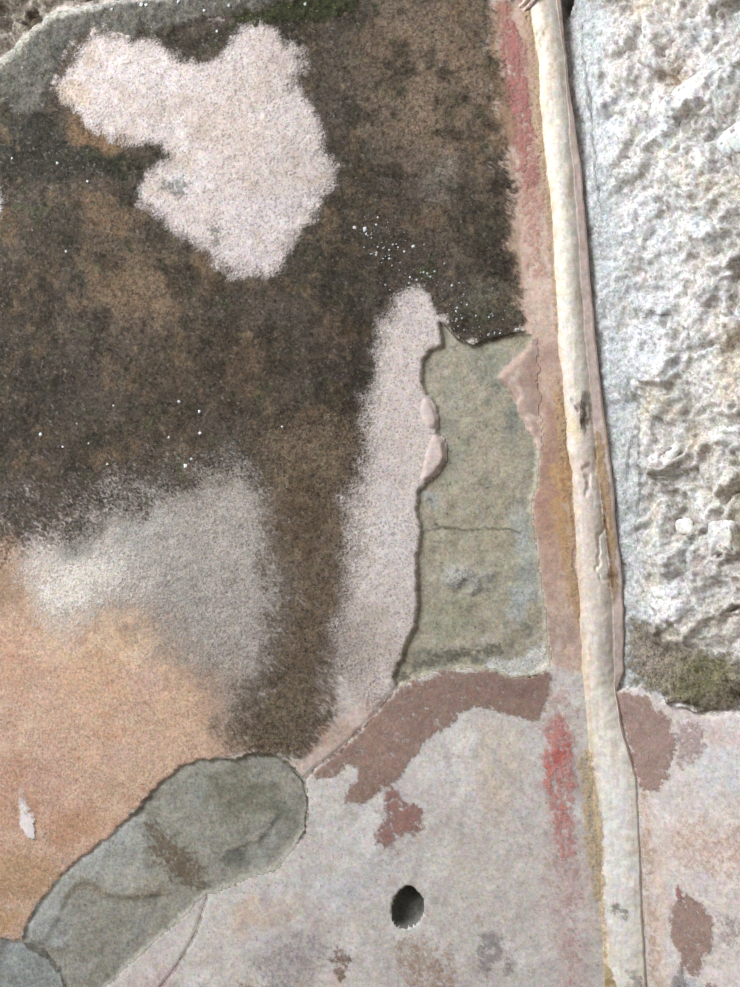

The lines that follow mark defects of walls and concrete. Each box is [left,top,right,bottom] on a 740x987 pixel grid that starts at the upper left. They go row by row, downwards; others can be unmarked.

water stain [0,0,549,763]
flaking render [392,322,552,689]
flaking render [0,752,309,987]
crack [159,896,207,987]